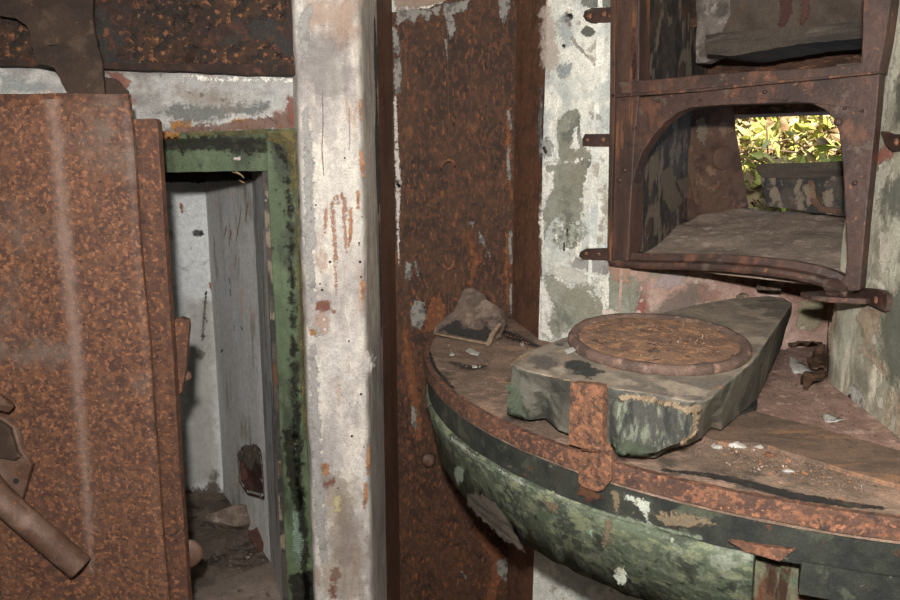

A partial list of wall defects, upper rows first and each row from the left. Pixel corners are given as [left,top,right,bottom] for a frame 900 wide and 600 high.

water stain [539,7,572,79]
corrosion [315,191,360,334]
water stain [538,203,546,252]
water stain [539,294,557,341]
corrosion [402,327,425,443]
corrosion [471,526,508,600]